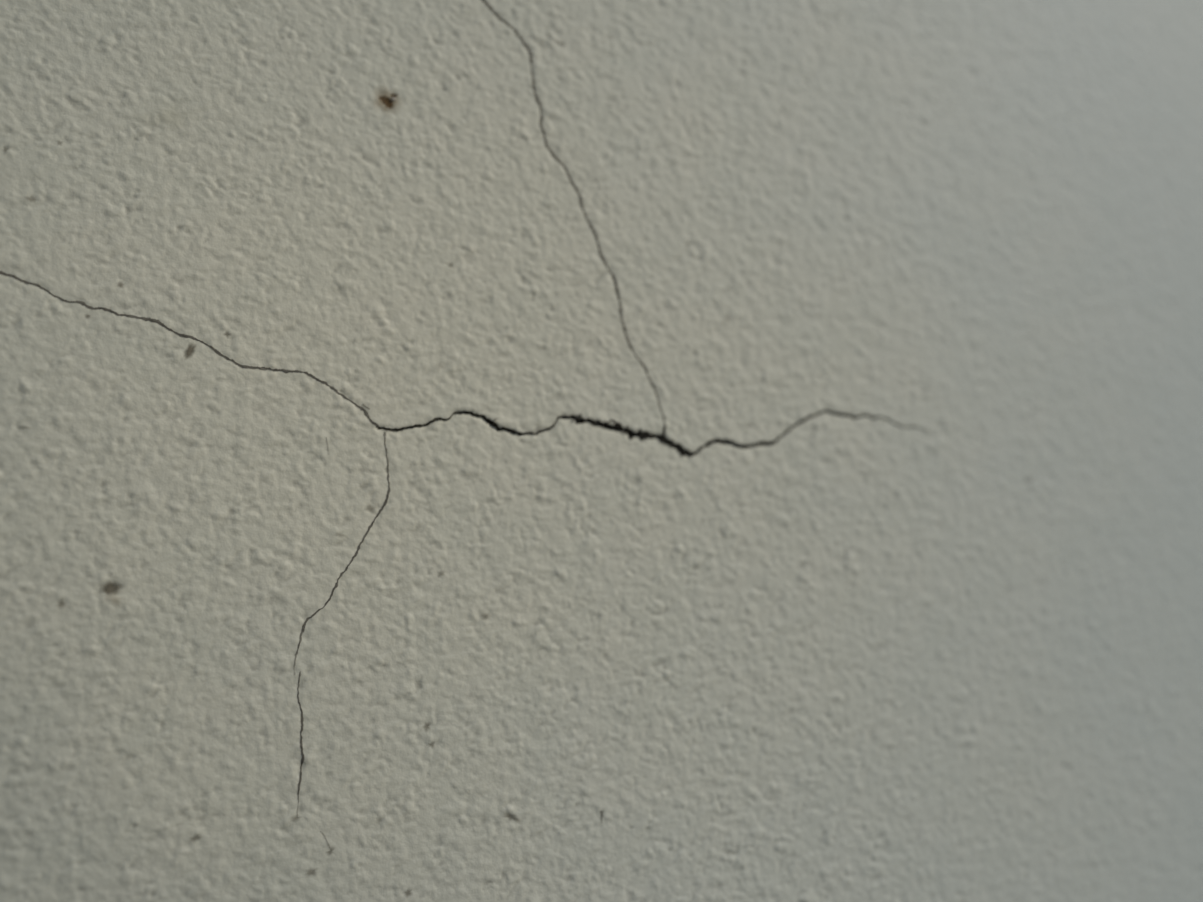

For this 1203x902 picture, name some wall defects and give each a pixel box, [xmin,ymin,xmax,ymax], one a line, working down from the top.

crack [0,0,899,803]